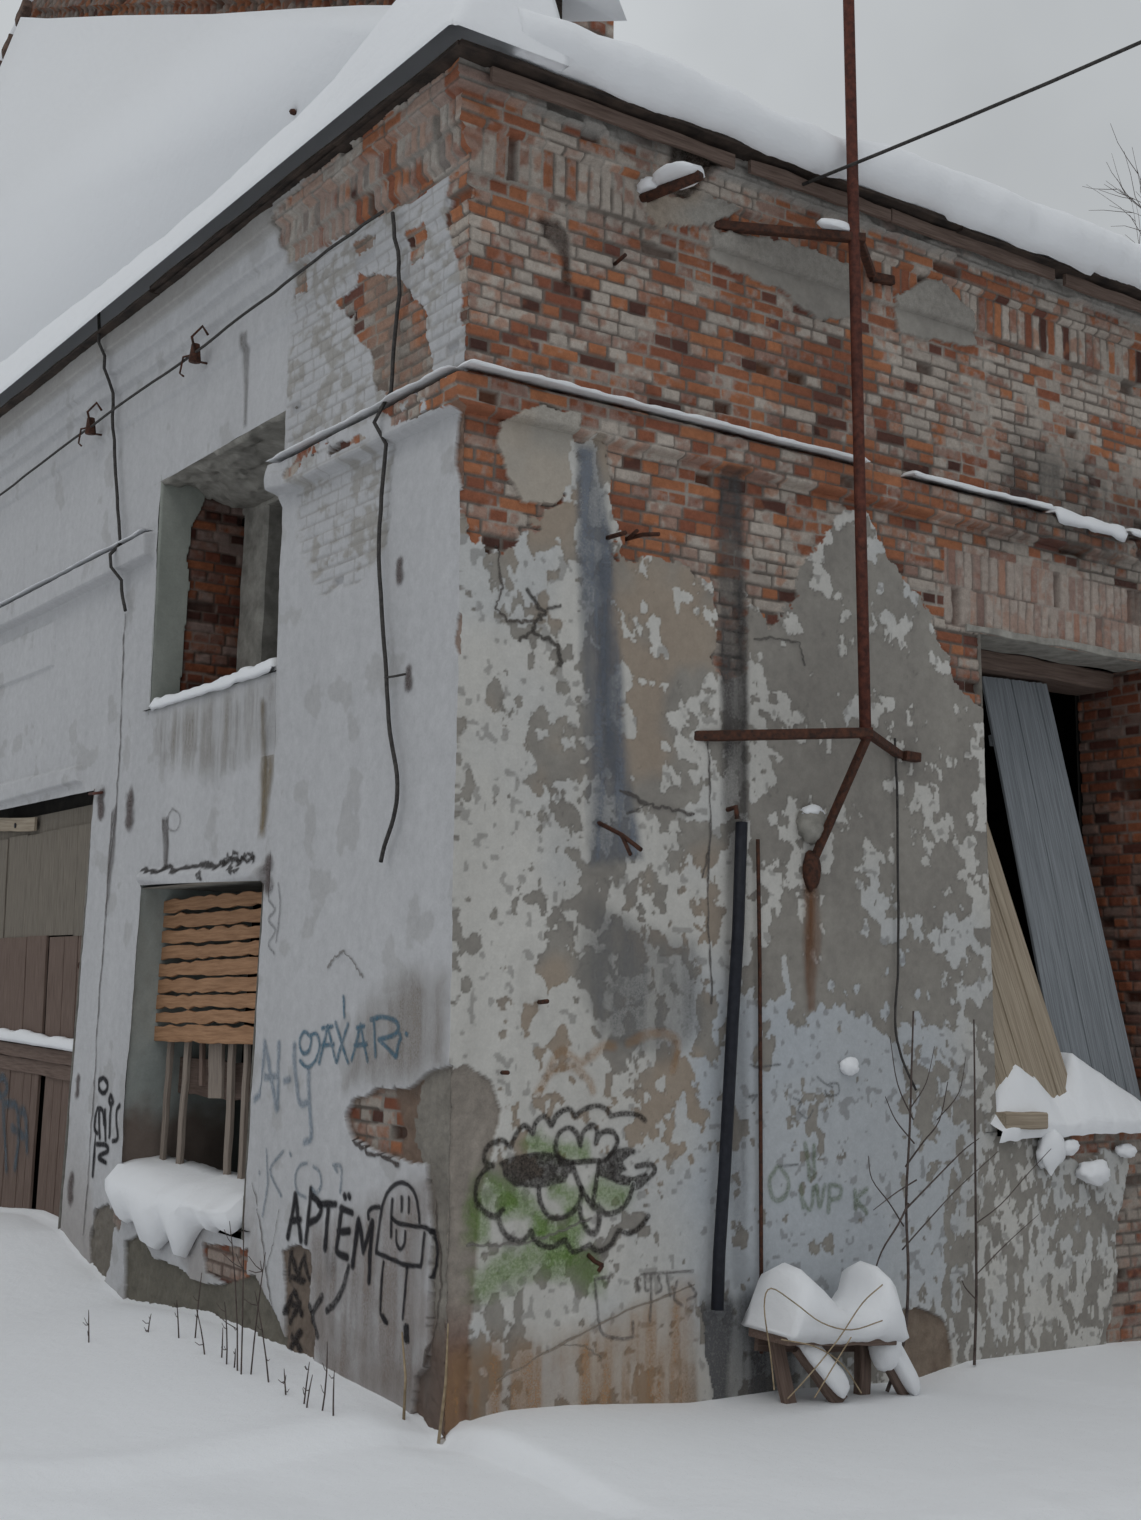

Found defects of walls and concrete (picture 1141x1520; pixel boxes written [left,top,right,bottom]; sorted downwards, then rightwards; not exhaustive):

crack [495,546,563,667]
damp [578,447,638,859]
spalling [282,151,1141,1377]
spalling [89,1204,316,1359]
spalling [344,1063,501,1437]